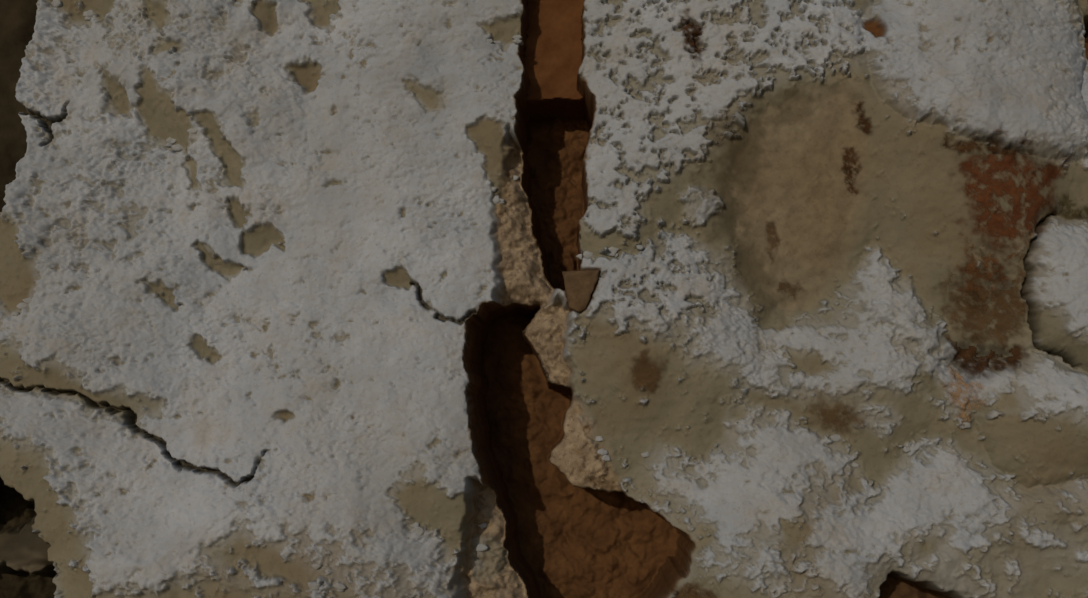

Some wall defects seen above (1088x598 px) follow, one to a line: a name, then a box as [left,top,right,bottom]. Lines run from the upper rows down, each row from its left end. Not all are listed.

peeling [481,12,528,53]
water stain [856,102,871,134]
peeling [474,132,519,209]
water stain [842,148,860,194]
crack [411,0,692,598]
peeling [576,222,664,261]
rust [942,131,1062,422]
crack [0,377,272,489]